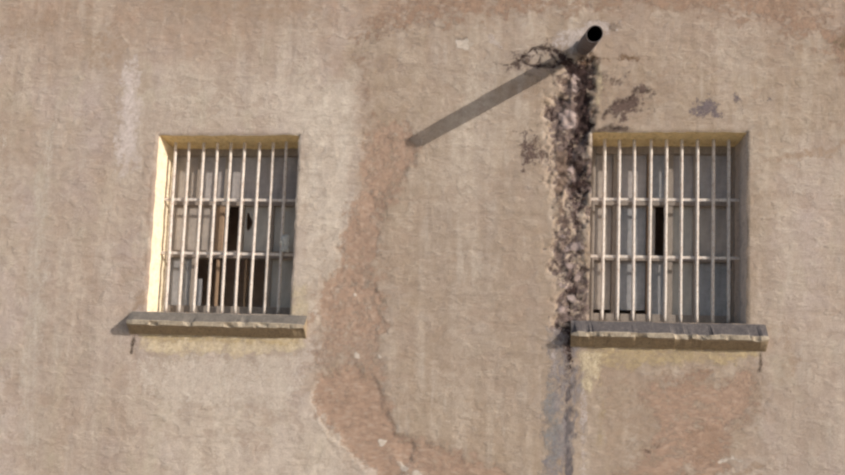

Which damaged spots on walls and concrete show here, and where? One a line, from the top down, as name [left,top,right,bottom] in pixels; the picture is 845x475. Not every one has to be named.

leakage [513,122,552,175]
leakage [348,0,845,149]